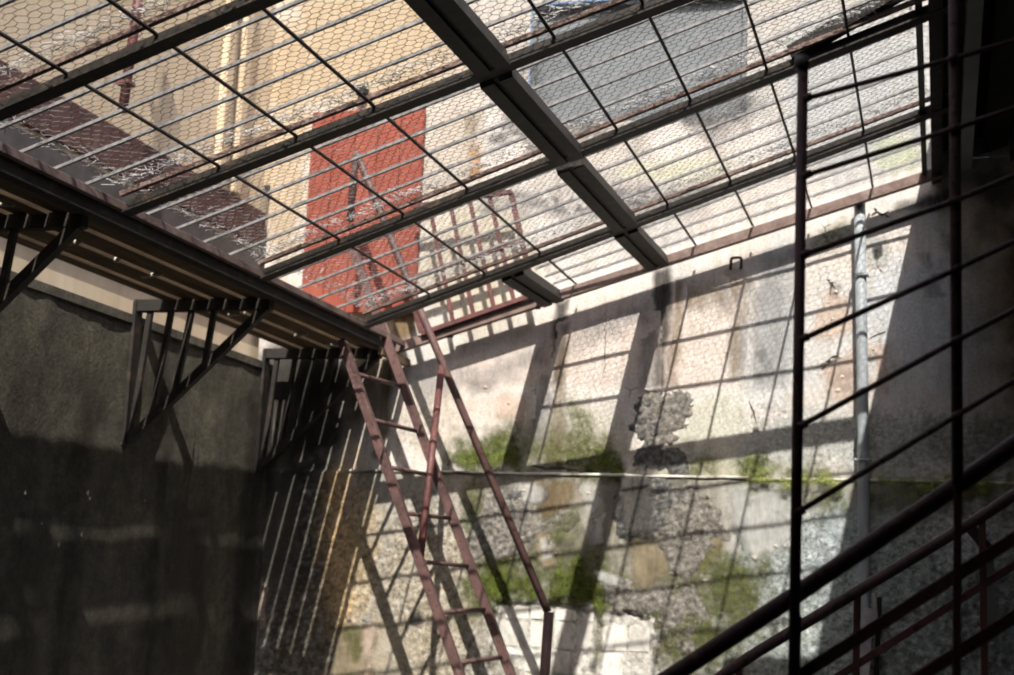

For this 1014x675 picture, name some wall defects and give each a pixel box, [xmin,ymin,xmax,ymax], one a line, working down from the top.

damp [645,268,703,386]
damp [378,359,391,439]
damp [533,301,593,473]
damp [344,474,359,522]
damp [542,480,573,517]
spalling [466,388,791,656]